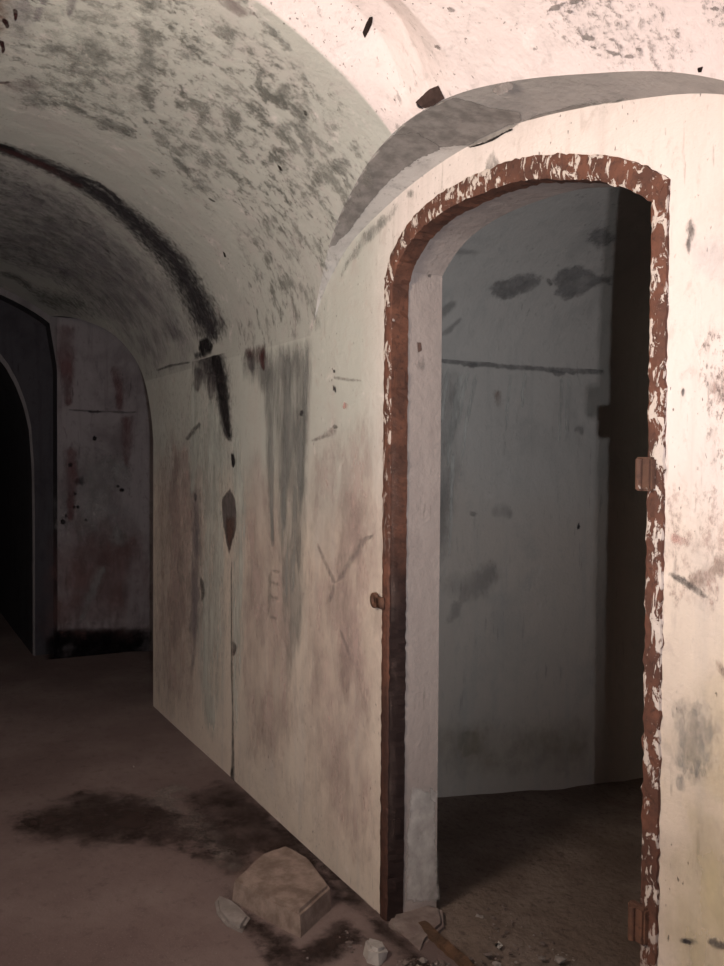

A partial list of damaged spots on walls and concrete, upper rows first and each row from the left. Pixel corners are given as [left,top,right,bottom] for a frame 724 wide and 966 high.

leakage [252,350,308,597]